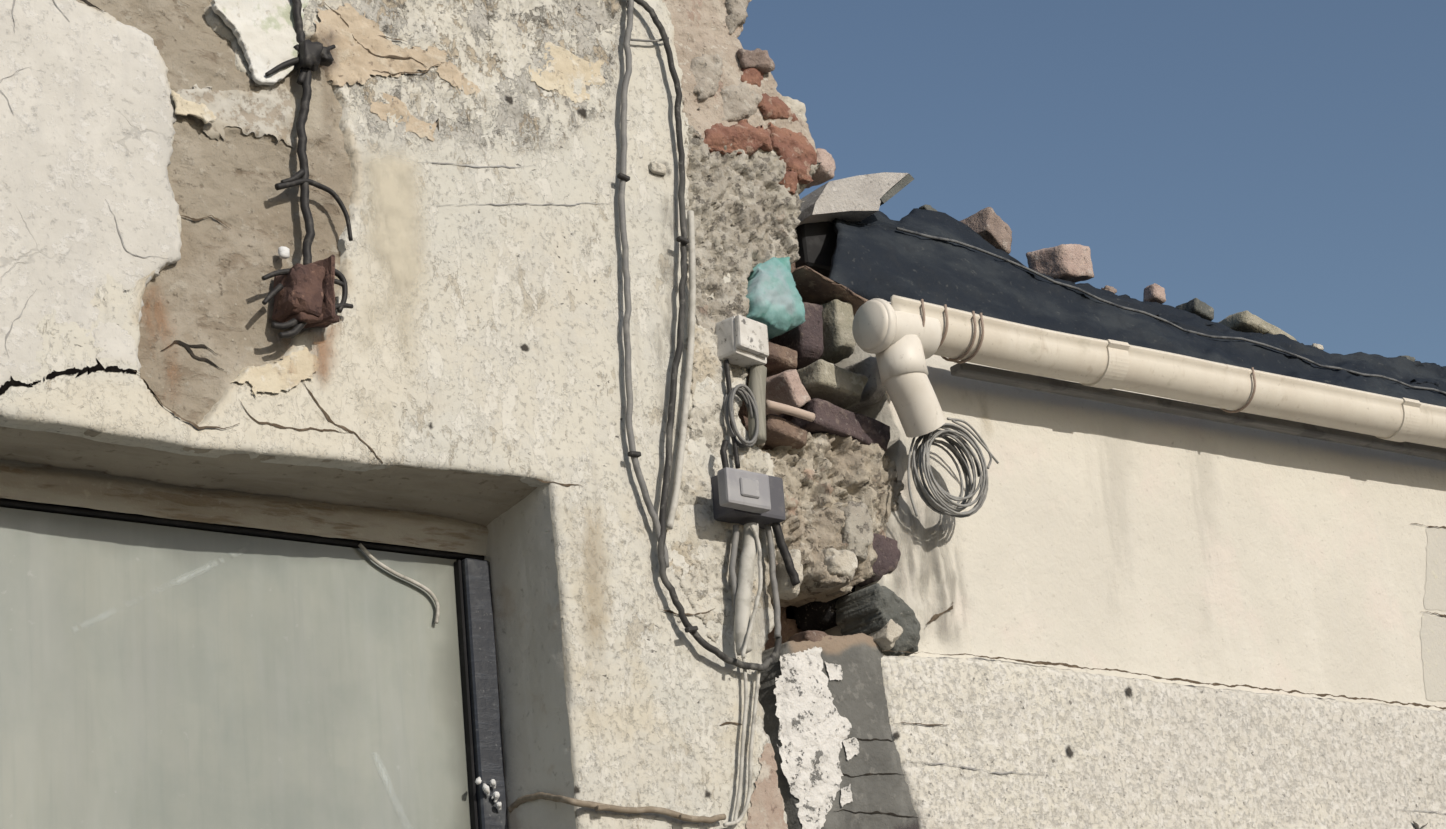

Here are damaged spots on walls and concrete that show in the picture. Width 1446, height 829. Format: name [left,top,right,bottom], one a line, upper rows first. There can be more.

peeling [528,42,605,104]
spalling [663,0,836,195]
spalling [76,0,481,425]
crack [0,289,383,464]
spalling [666,324,860,829]